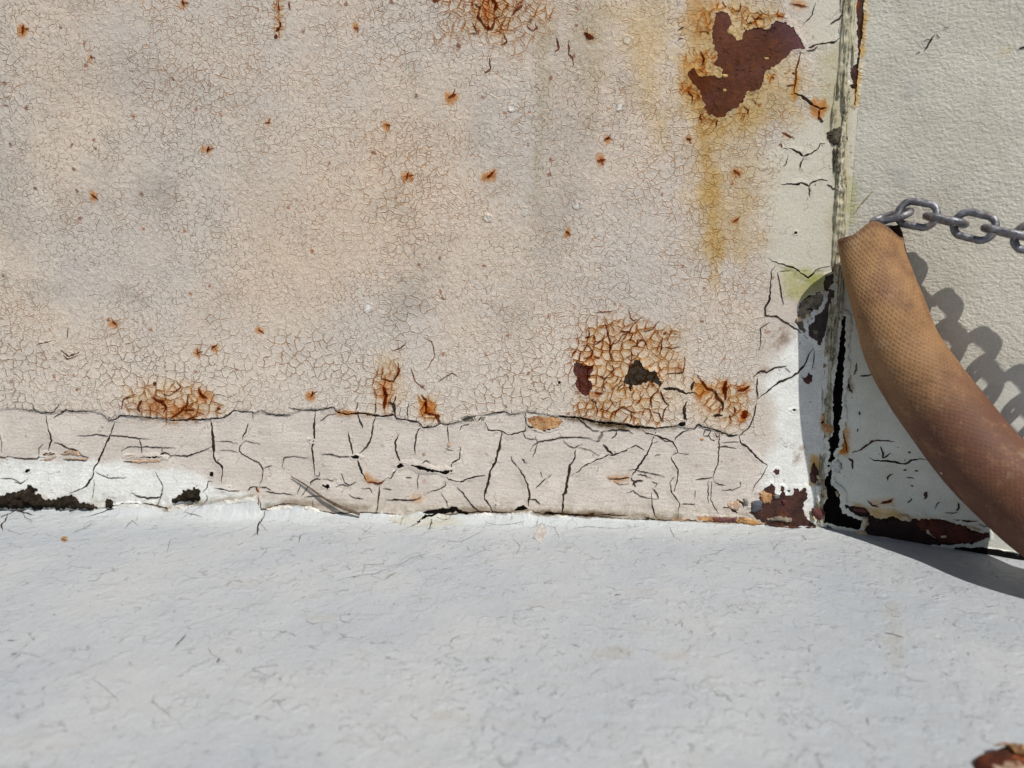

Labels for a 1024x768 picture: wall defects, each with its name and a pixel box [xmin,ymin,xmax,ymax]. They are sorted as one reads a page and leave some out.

corrosion [433,0,553,53]
corrosion [786,52,827,122]
peeling [792,270,845,350]
corrosion [121,379,222,424]
corrosion [372,343,439,424]
crack [0,255,834,579]
corrosion [571,309,686,423]
corrosion [695,375,750,424]
peeling [722,481,821,529]